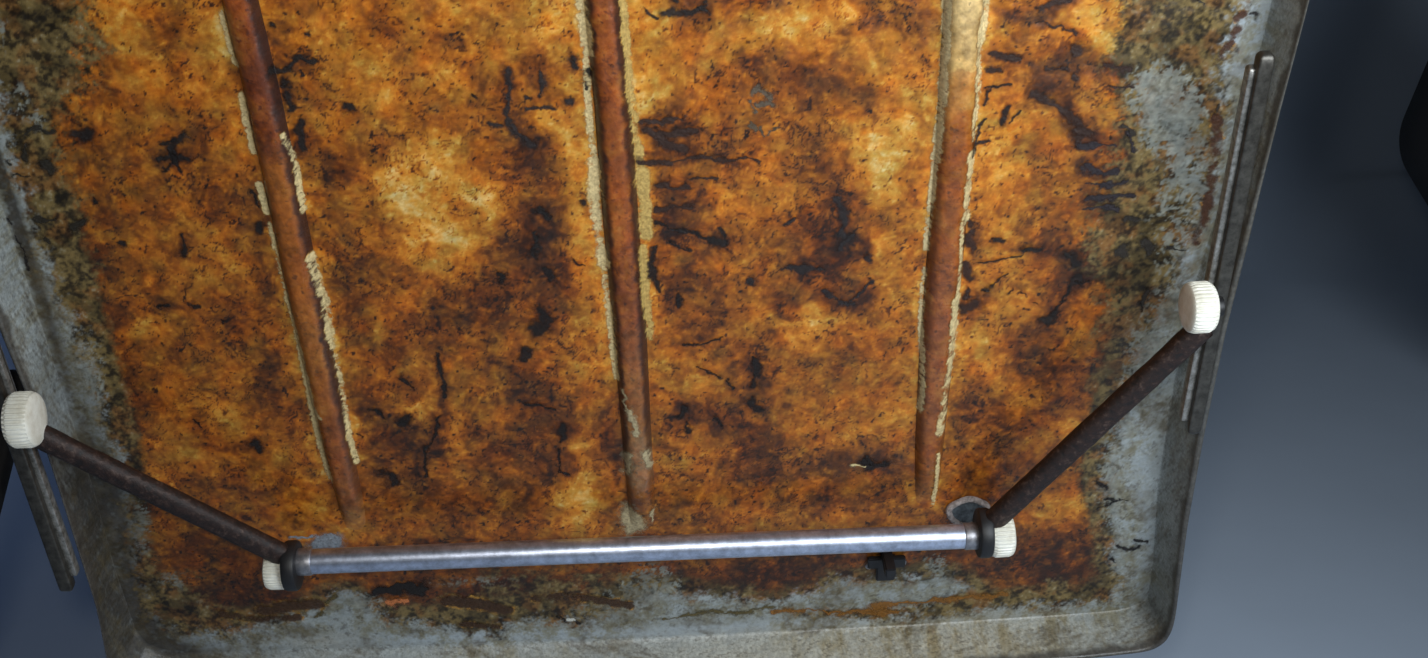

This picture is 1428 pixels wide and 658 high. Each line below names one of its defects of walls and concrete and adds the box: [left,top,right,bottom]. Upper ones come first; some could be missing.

corrosion [1219,10,1259,58]
corrosion [1192,114,1225,246]
corrosion [218,595,338,623]